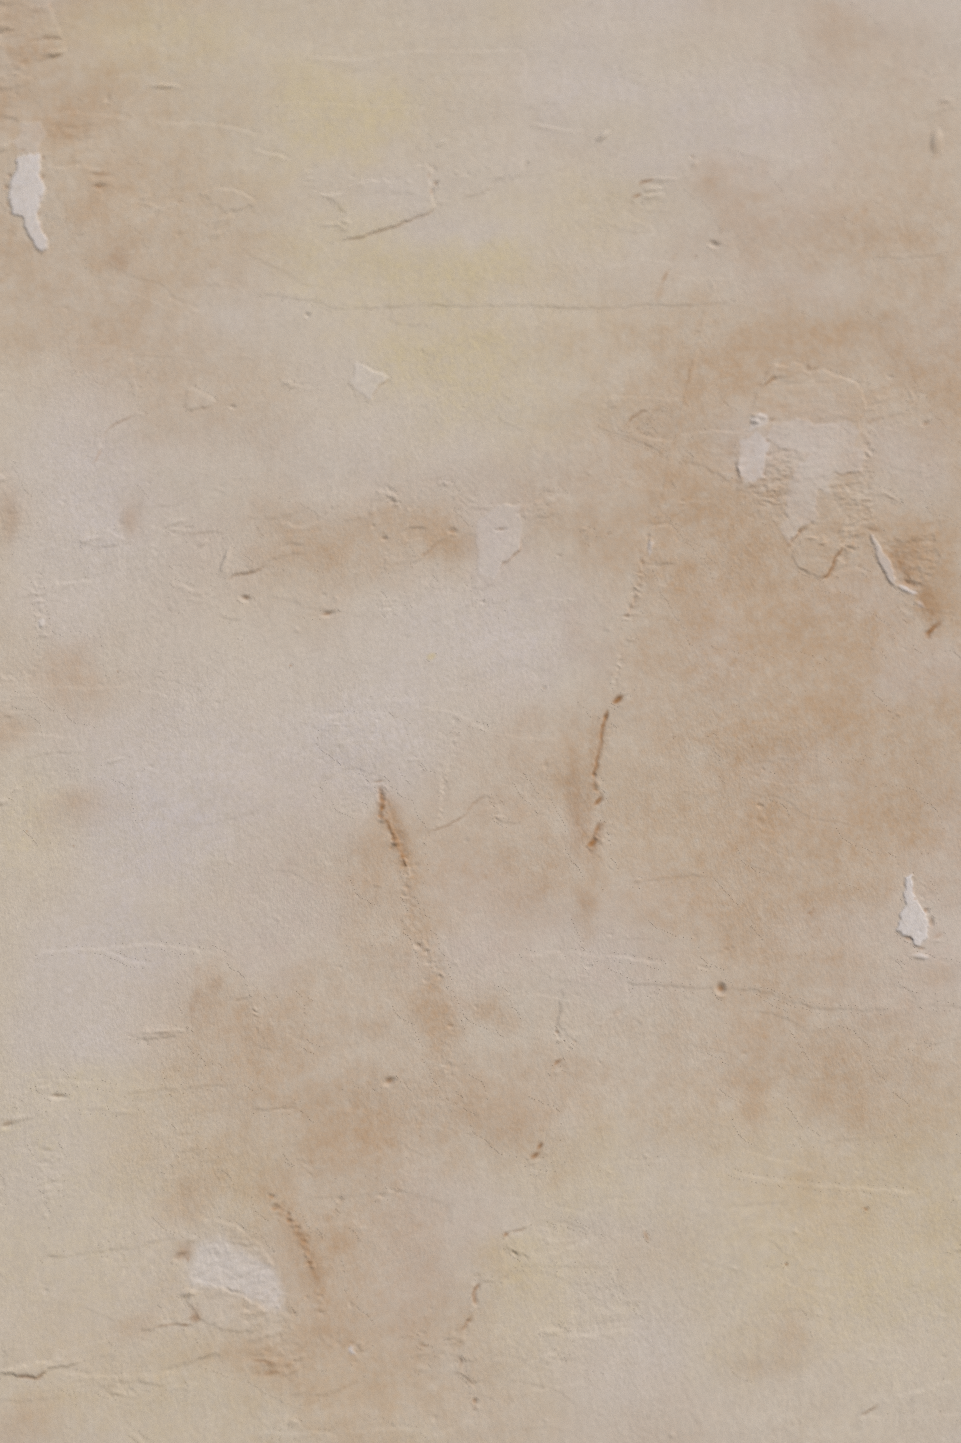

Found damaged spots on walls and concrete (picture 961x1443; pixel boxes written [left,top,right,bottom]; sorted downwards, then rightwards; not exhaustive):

peeling [0,121,51,255]
water stain [715,309,883,411]
crack [586,277,718,878]
spalling [863,516,957,641]
water stain [696,569,895,783]
water stain [832,783,945,857]
peeling [894,872,948,973]
water stain [462,985,521,1038]